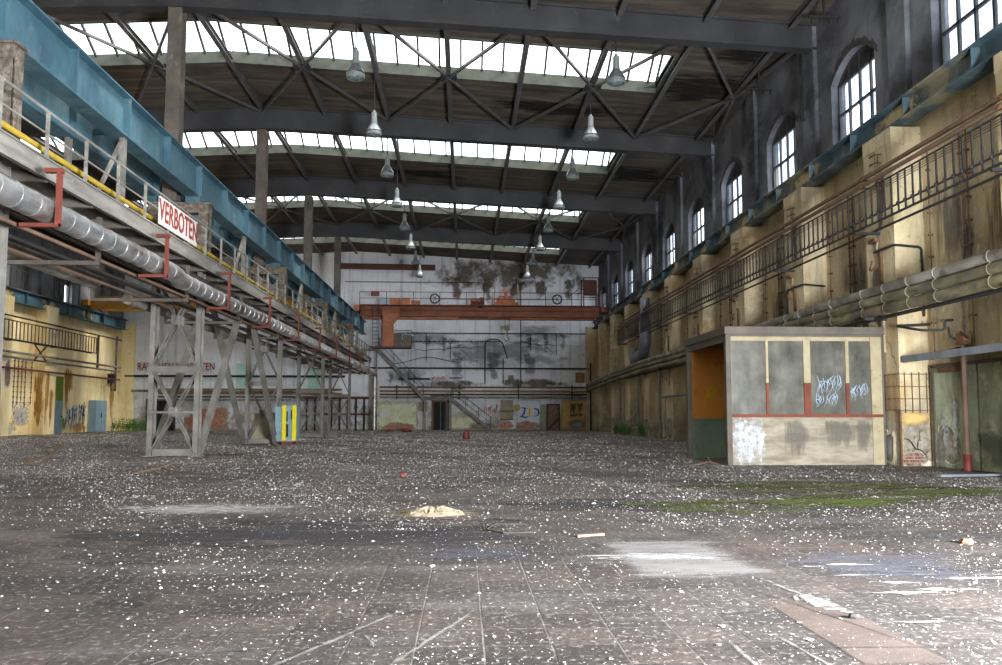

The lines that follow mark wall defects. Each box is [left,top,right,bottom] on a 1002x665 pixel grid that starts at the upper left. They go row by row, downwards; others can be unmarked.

damp [439,260,580,299]
corrosion [34,373,53,427]
damp [787,421,805,450]
damp [826,421,869,444]
spalling [886,401,964,469]